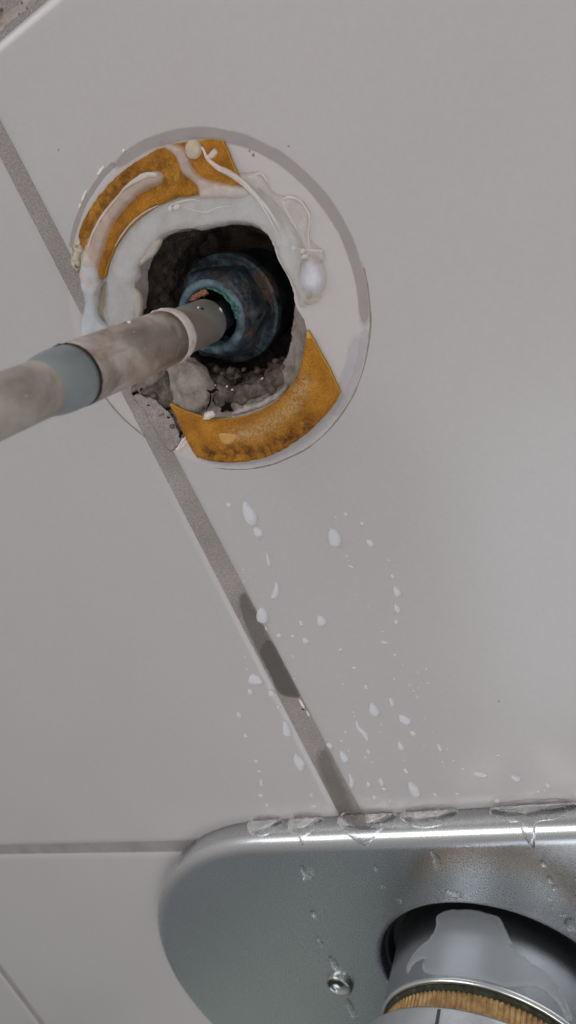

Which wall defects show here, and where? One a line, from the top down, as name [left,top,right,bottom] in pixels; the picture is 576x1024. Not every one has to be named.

hole [139,220,276,316]
spalling [130,288,307,453]